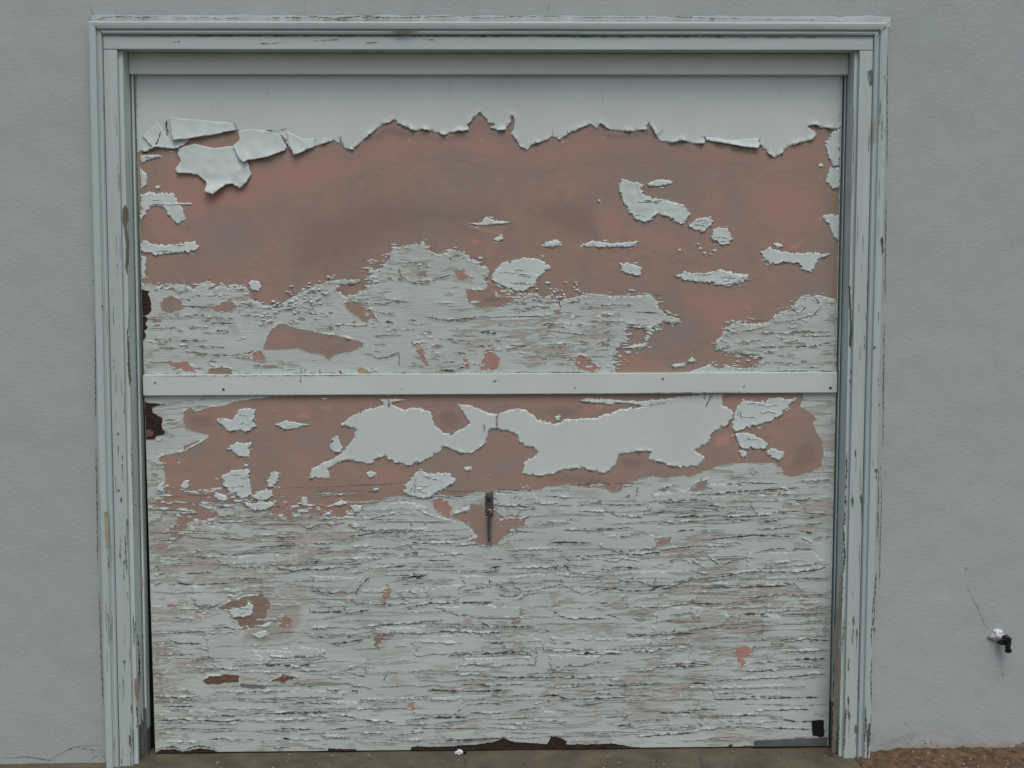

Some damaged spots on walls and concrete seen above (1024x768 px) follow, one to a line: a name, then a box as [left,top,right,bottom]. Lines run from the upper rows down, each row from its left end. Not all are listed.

peeling [122,125,852,374]
crack [2,445,882,766]
peeling [140,393,871,753]